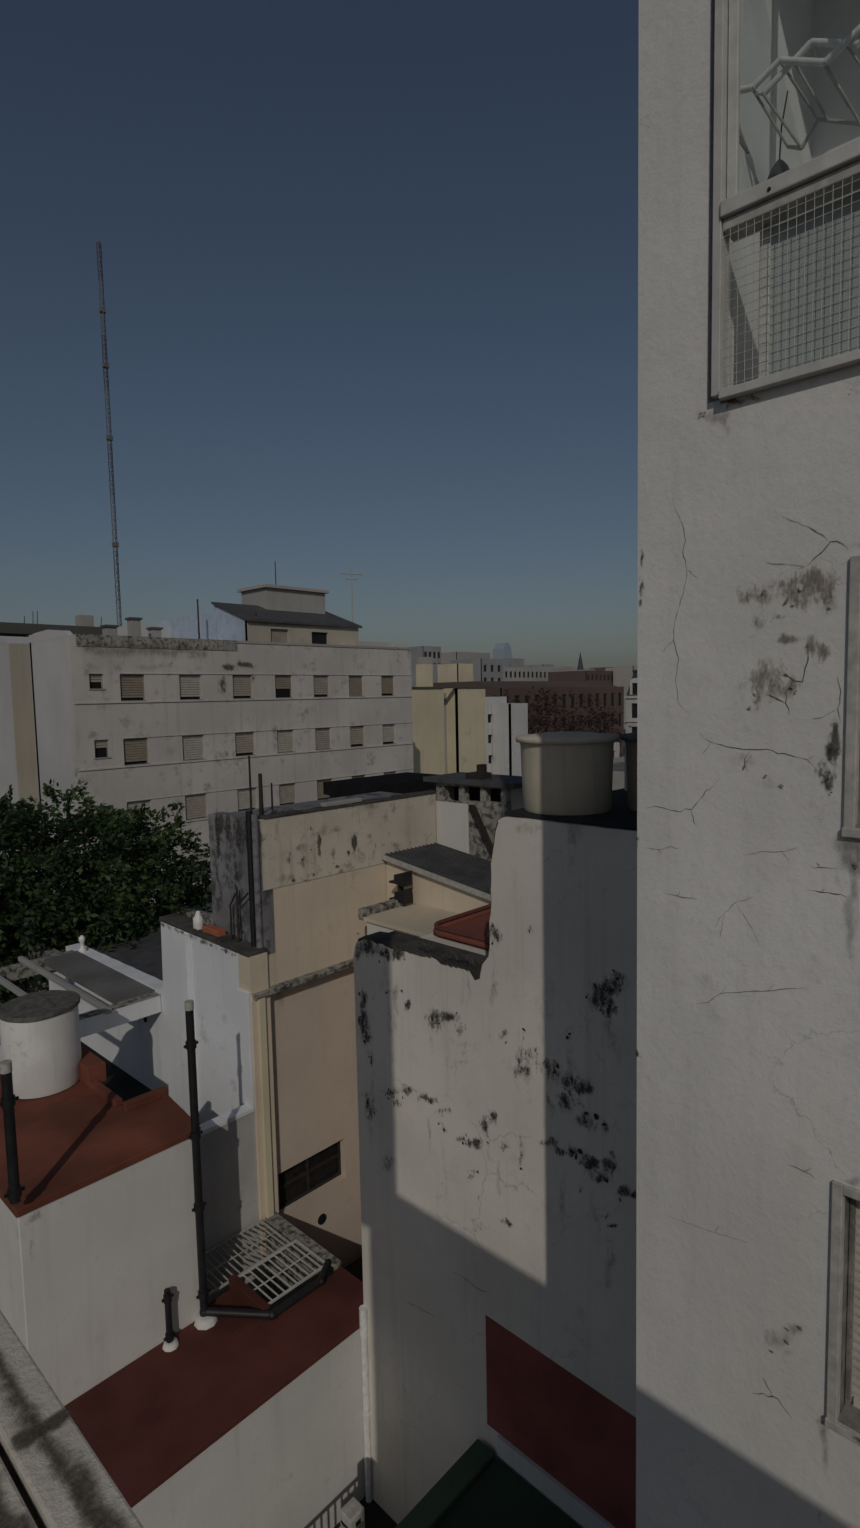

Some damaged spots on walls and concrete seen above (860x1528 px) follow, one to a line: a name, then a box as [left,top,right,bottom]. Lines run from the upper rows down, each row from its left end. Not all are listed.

crack [771,517,849,569]
peeling [746,569,834,659]
leakage [819,723,841,793]
leakage [0,1354,125,1528]